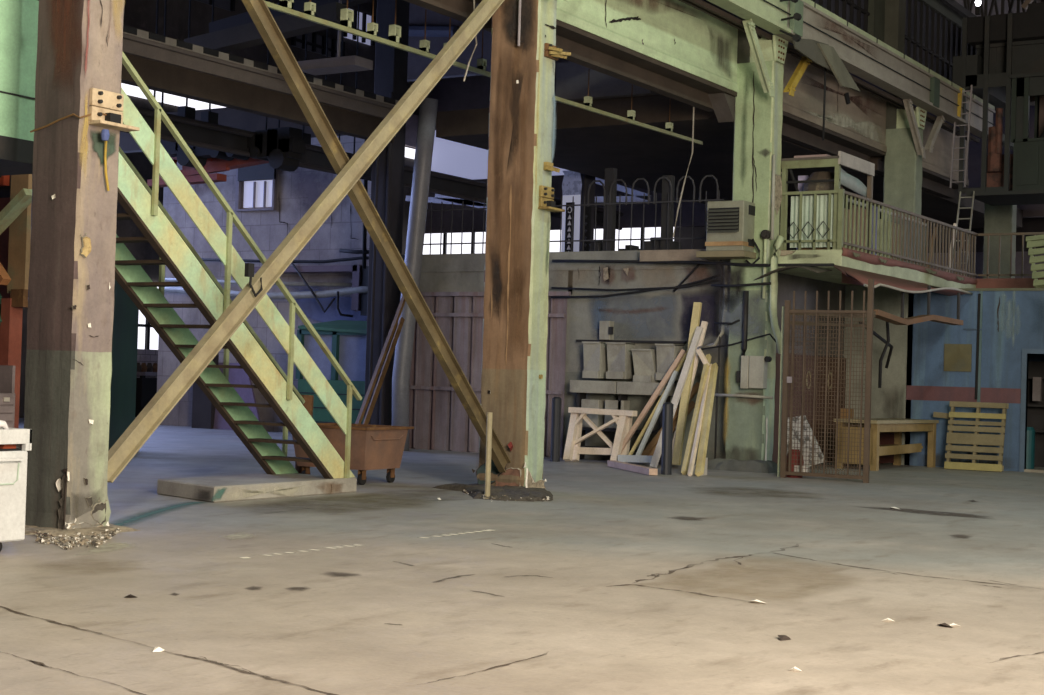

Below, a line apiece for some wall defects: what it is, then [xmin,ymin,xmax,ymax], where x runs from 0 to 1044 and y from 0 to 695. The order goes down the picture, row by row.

spalling [56,468,109,529]
crack [606,553,939,597]
crack [0,606,101,633]
crack [7,653,74,674]
crack [175,654,338,695]